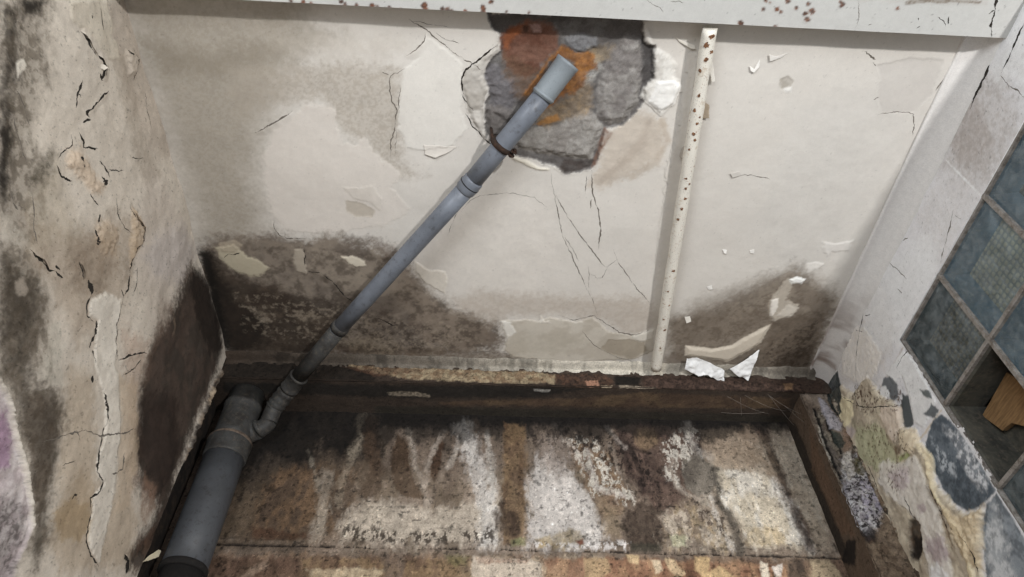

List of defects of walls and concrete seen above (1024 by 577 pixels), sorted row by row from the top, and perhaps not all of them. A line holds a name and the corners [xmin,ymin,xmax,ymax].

crack [383,21,498,154]
corrosion [419,0,599,128]
spalling [394,12,683,176]
corrosion [760,0,817,27]
corrosion [894,0,983,12]
crack [971,0,1023,106]
crack [11,11,151,566]
damp [578,50,846,368]
peeling [683,238,856,362]
damp [123,224,401,577]
damp [207,411,836,577]
spalling [807,324,988,577]